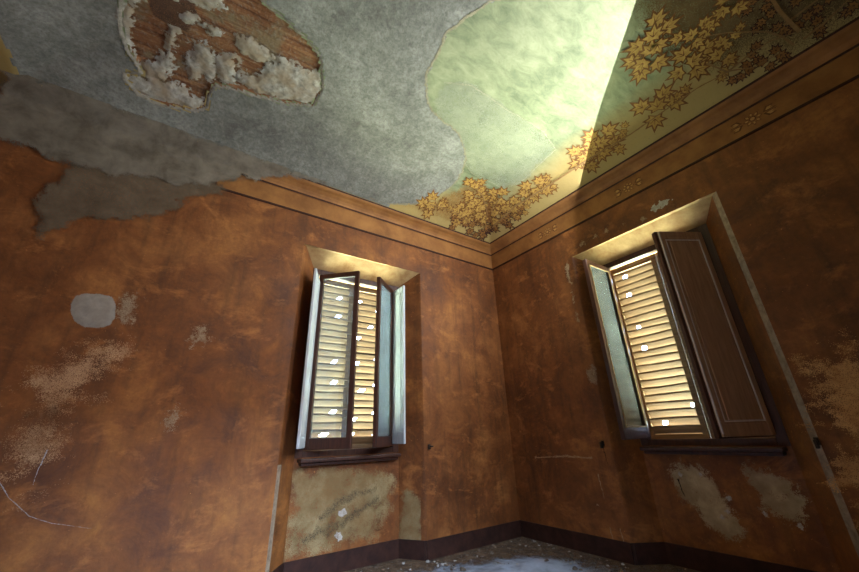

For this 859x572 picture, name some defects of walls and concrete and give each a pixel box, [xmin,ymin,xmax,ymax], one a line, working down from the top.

peeling [0,0,501,241]
peeling [284,465,421,562]
peeling [667,458,749,543]
peeling [740,459,813,530]